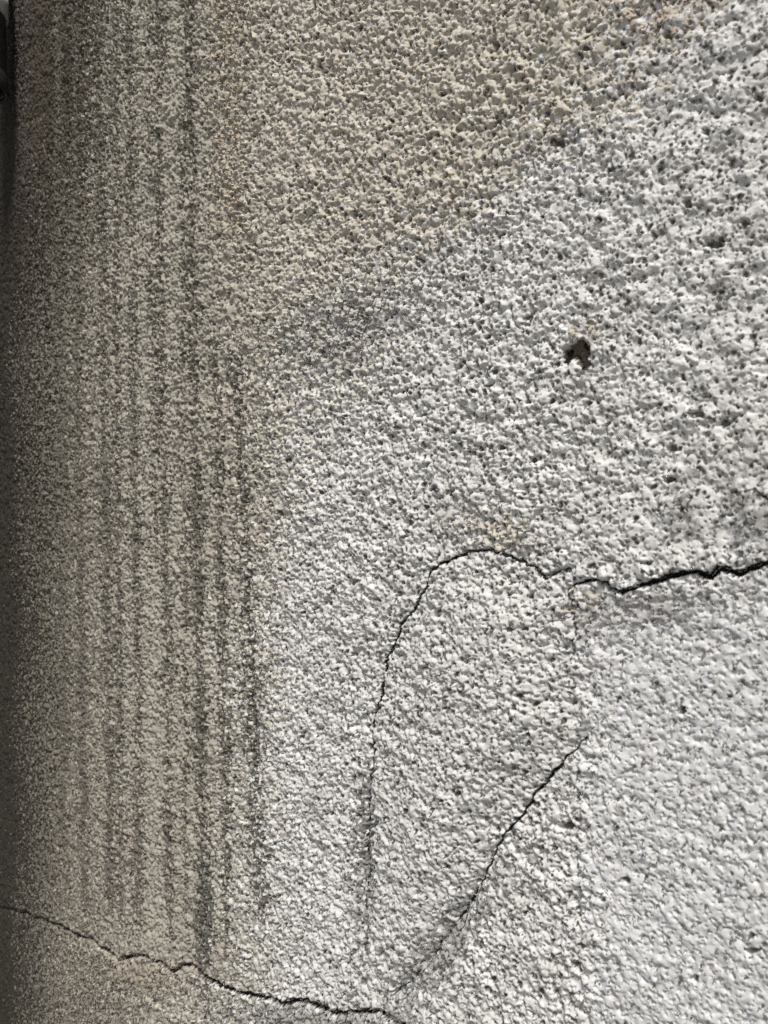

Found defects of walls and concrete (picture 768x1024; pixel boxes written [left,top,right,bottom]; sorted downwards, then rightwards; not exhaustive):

leakage [698,16,721,46]
crack [236,371,264,911]
crack [0,737,588,1024]
crack [364,549,768,908]